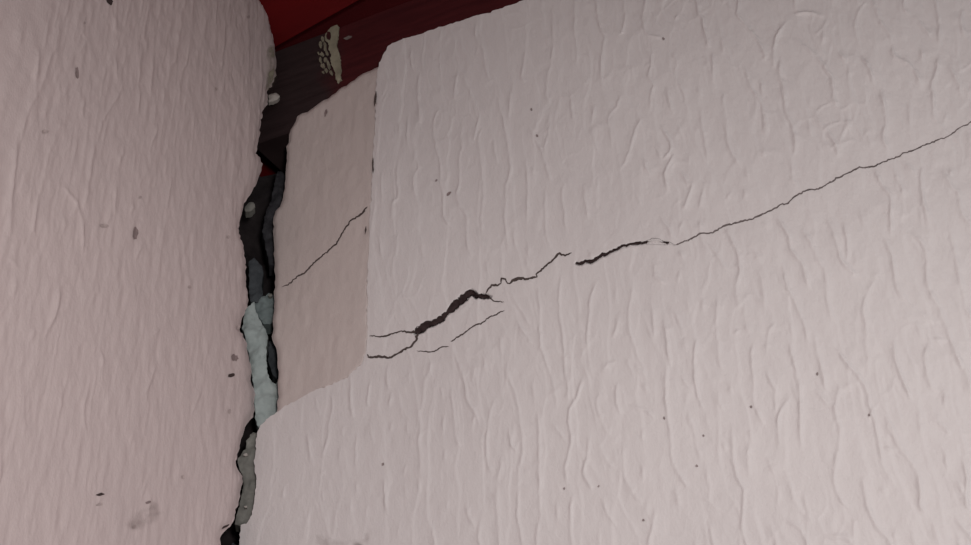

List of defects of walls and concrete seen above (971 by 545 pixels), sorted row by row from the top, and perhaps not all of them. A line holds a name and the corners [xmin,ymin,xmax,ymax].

crack [220,171,367,545]
crack [367,121,971,359]